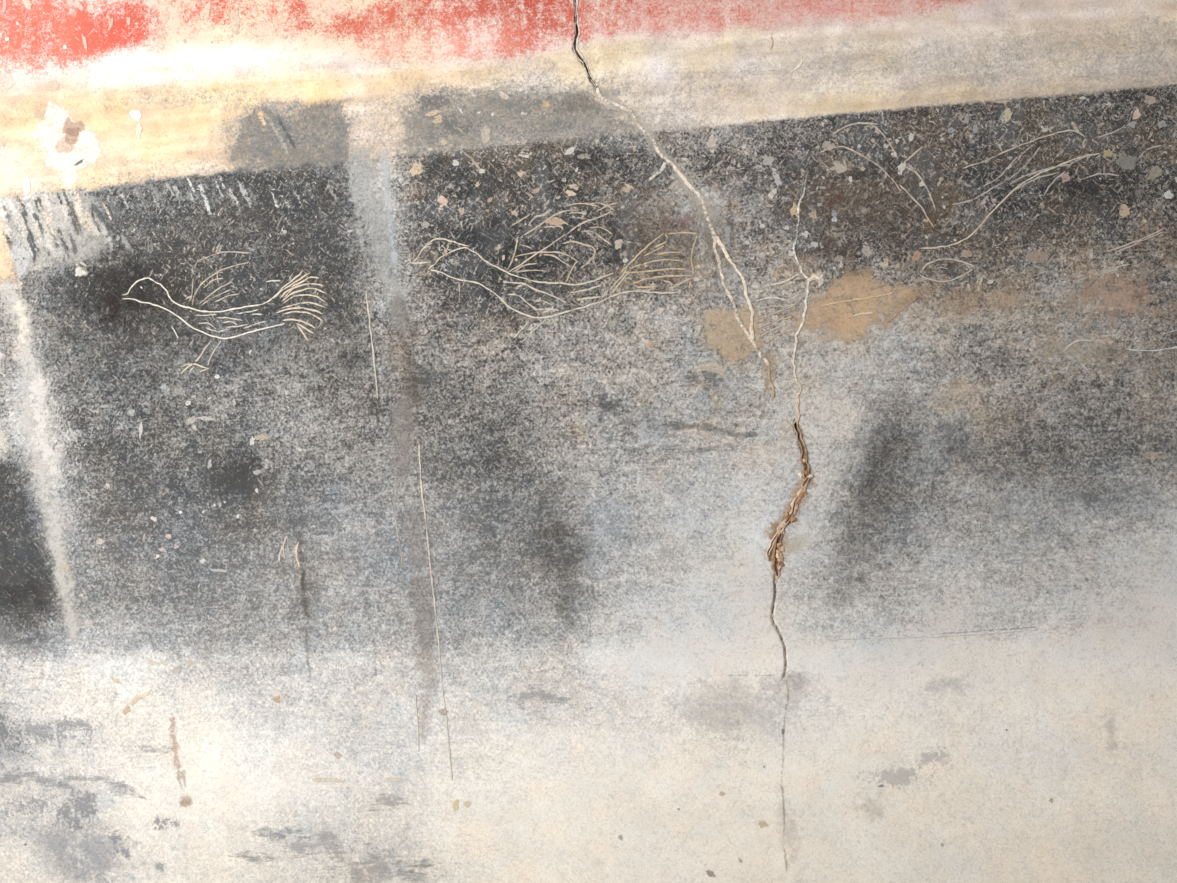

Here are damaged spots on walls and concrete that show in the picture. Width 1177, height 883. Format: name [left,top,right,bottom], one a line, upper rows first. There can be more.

peeling [68,0,95,13]
damp [0,282,80,643]
crack [570,0,823,584]
damp [797,269,926,340]